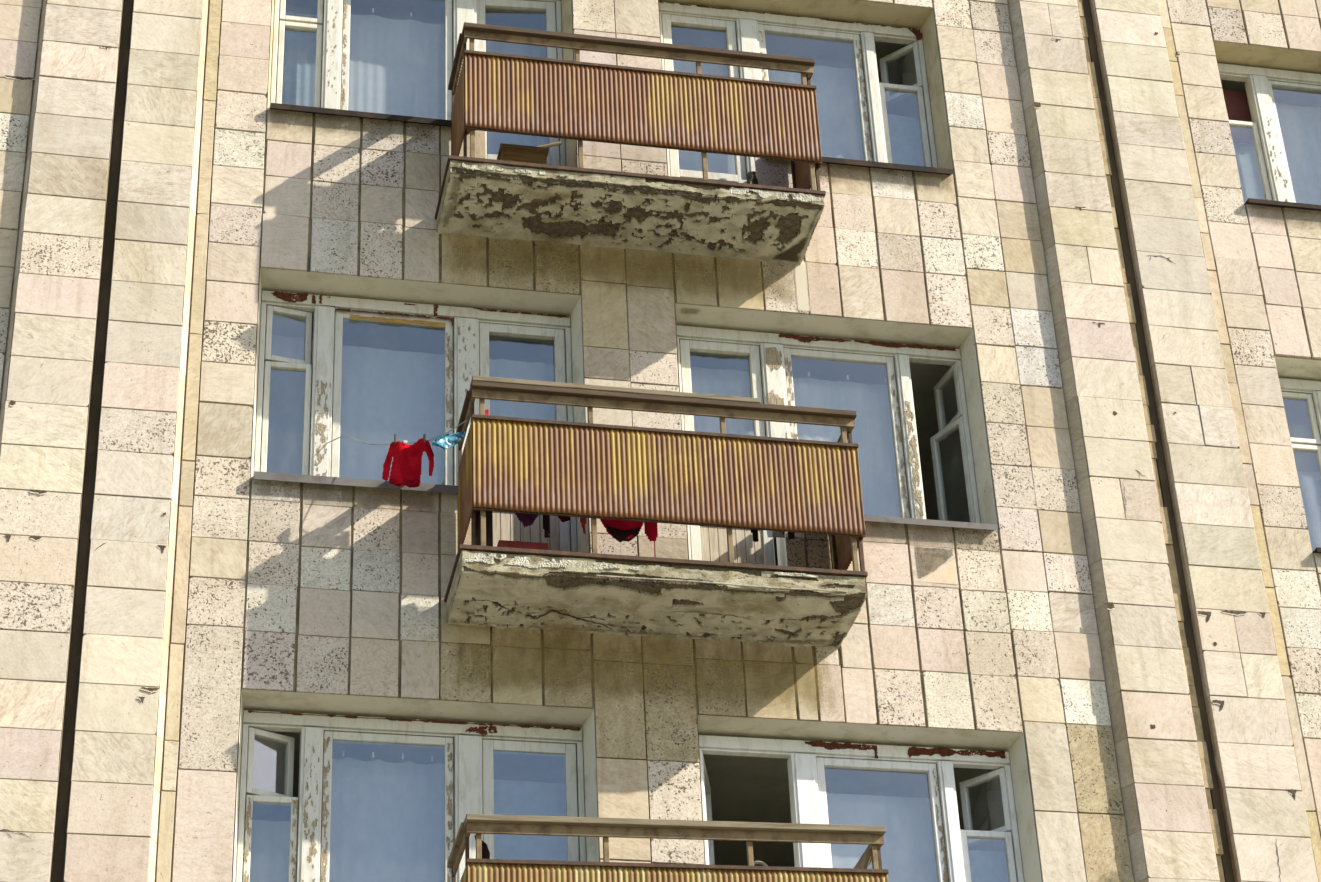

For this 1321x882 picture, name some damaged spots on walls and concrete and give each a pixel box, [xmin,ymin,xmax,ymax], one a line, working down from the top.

spalling [452,163,822,251]
peeling [313,380,331,476]
peeling [891,374,924,519]
spalling [454,553,864,646]
corrosion [805,740,878,759]
corrosion [907,747,1006,758]